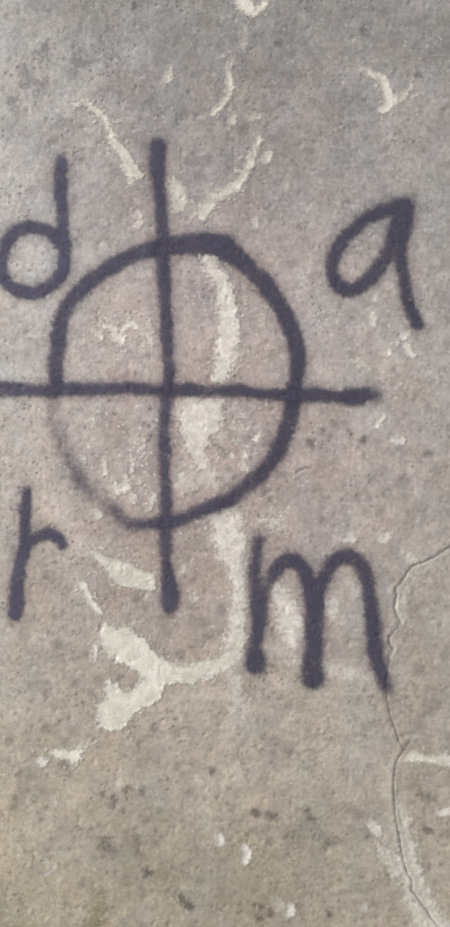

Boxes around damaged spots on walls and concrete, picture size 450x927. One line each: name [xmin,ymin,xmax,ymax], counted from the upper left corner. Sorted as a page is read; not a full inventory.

crack [385,545,450,927]